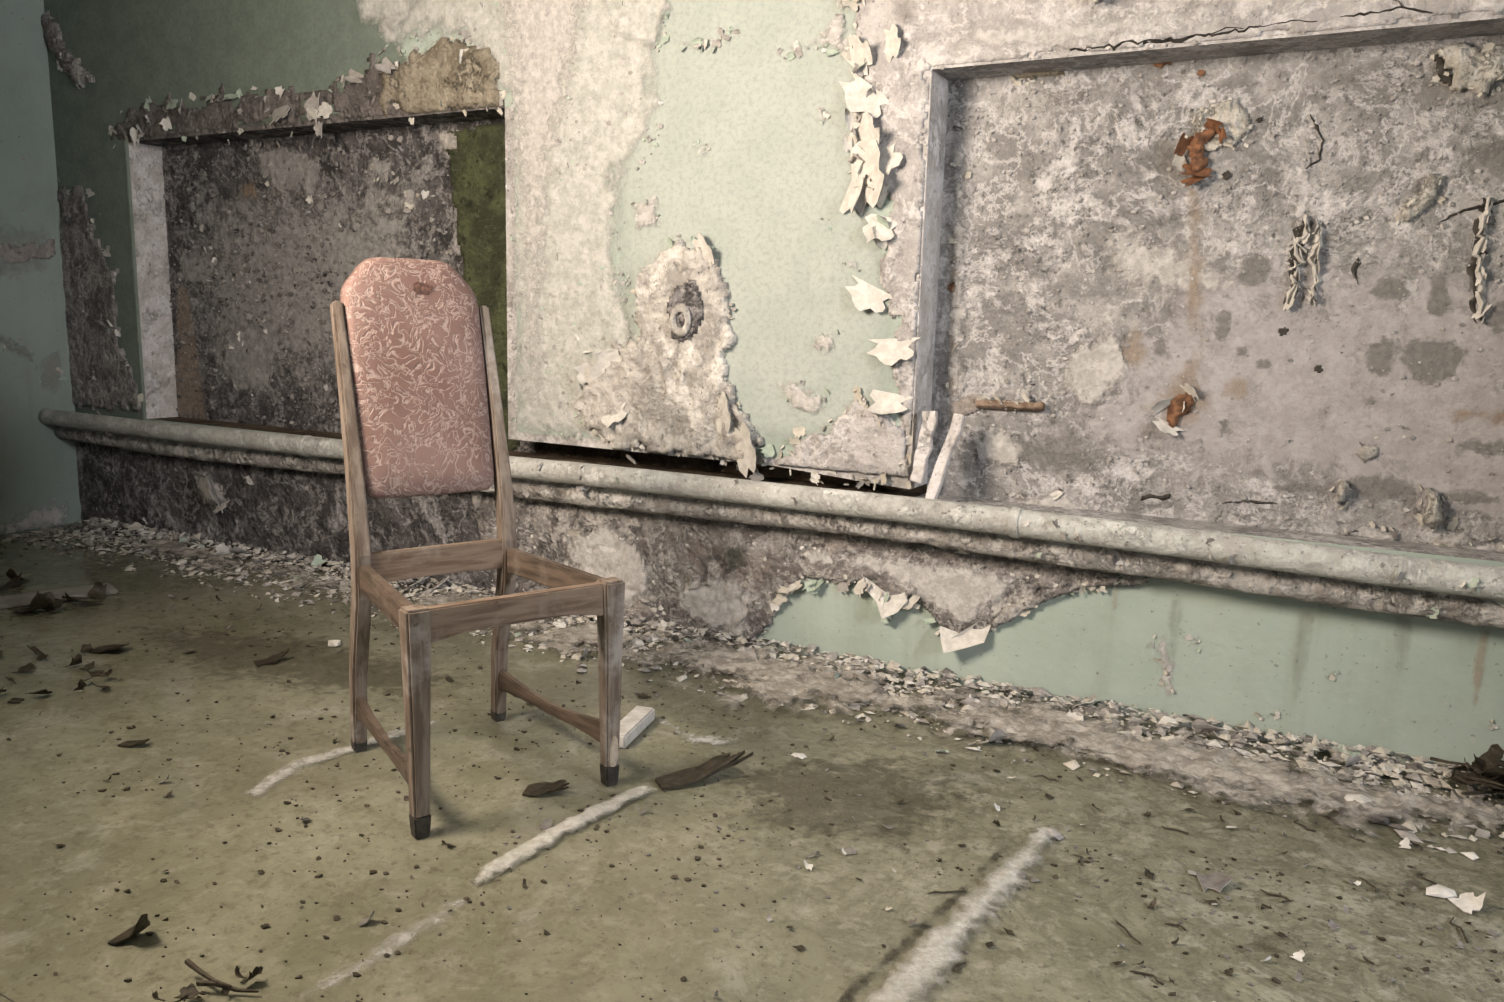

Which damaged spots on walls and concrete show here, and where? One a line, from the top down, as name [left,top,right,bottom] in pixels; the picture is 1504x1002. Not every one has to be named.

crack [1070,0,1433,52]
corrosion [1172,118,1227,187]
peeling [108,29,507,445]
crack [1440,199,1504,222]
peeling [57,176,144,415]
peeling [574,0,1504,577]
corrosion [975,391,1045,412]
corrosion [1151,383,1199,436]
peeling [75,441,351,571]
peeling [366,491,497,552]
peeling [412,569,497,597]
peeling [513,491,1151,653]